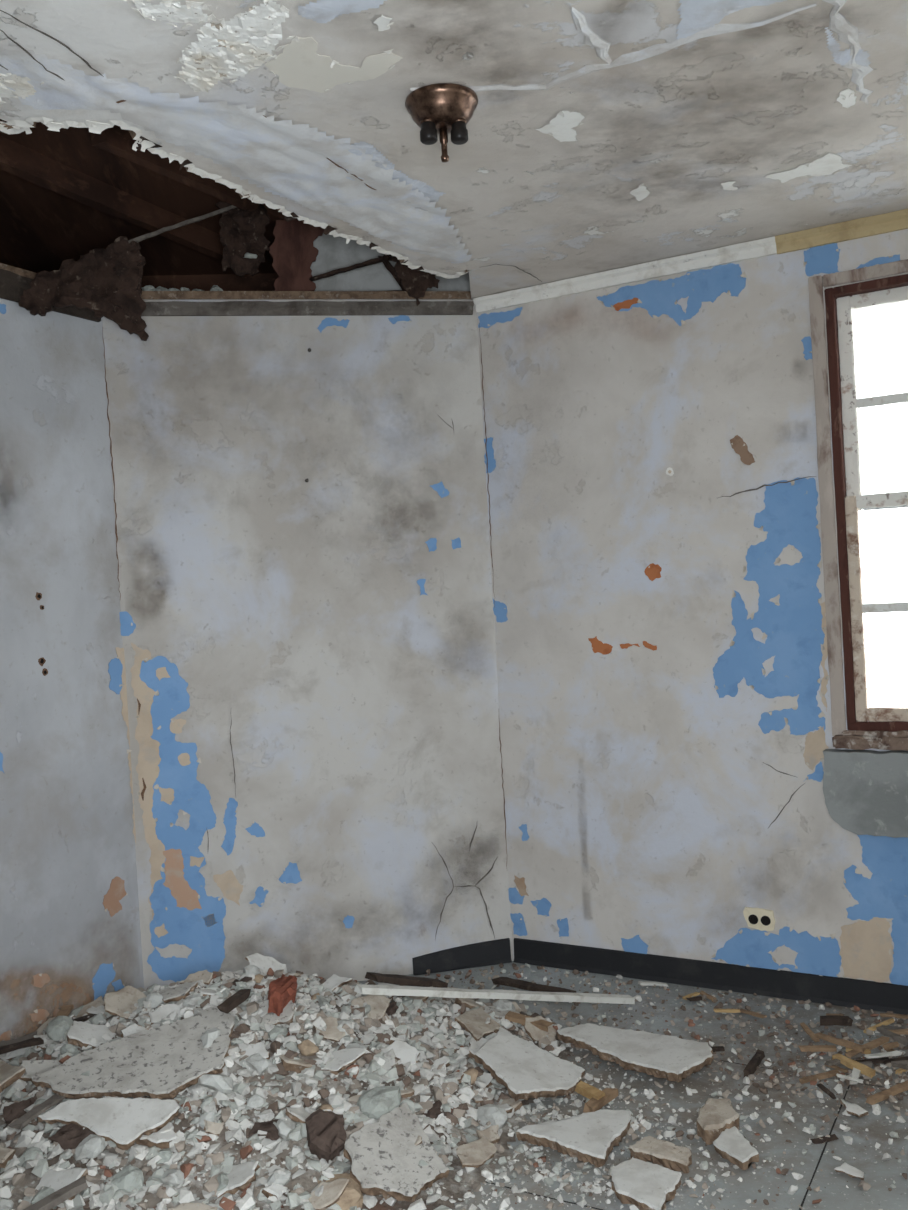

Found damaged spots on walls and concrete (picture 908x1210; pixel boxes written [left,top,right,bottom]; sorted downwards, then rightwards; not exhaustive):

peeling [123,0,403,93]
peeling [837,88,857,108]
spalling [0,72,470,279]
peeling [764,153,852,183]
peeling [596,263,747,326]
peeling [713,477,829,782]
peeling [108,611,269,982]
peeling [278,862,302,884]
peeling [711,835,908,986]